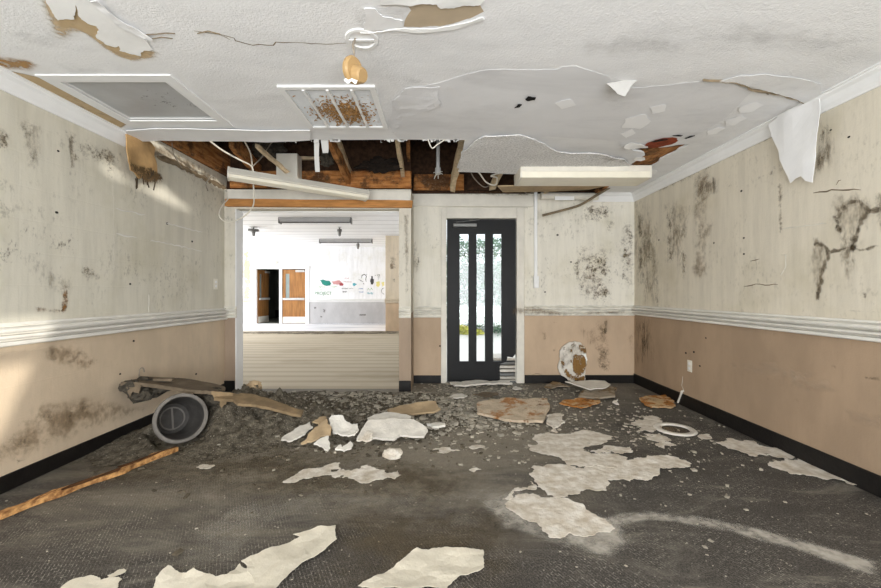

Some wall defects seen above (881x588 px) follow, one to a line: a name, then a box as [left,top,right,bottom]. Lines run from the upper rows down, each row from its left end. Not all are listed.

peeling [46,0,153,56]
crack [197,30,341,46]
spalling [360,0,485,34]
flaking render [388,66,822,183]
peeling [125,128,311,190]
water stain [844,201,880,241]
water stain [814,242,842,299]